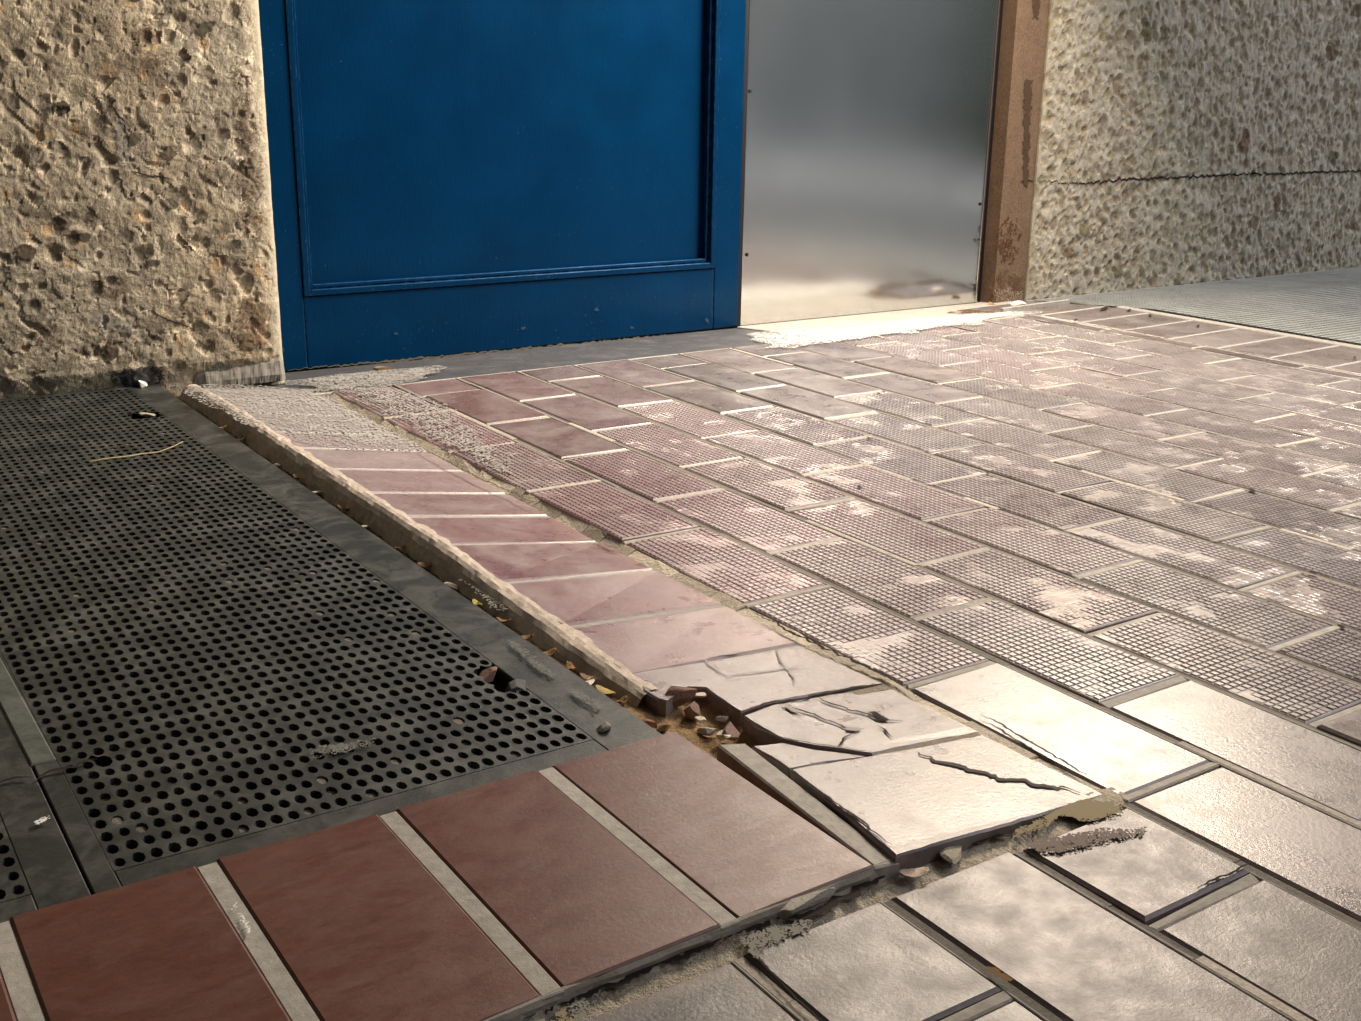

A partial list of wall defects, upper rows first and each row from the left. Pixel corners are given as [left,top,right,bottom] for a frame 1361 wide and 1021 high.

crack [1021,169,1361,185]
crack [524,612,1087,1021]